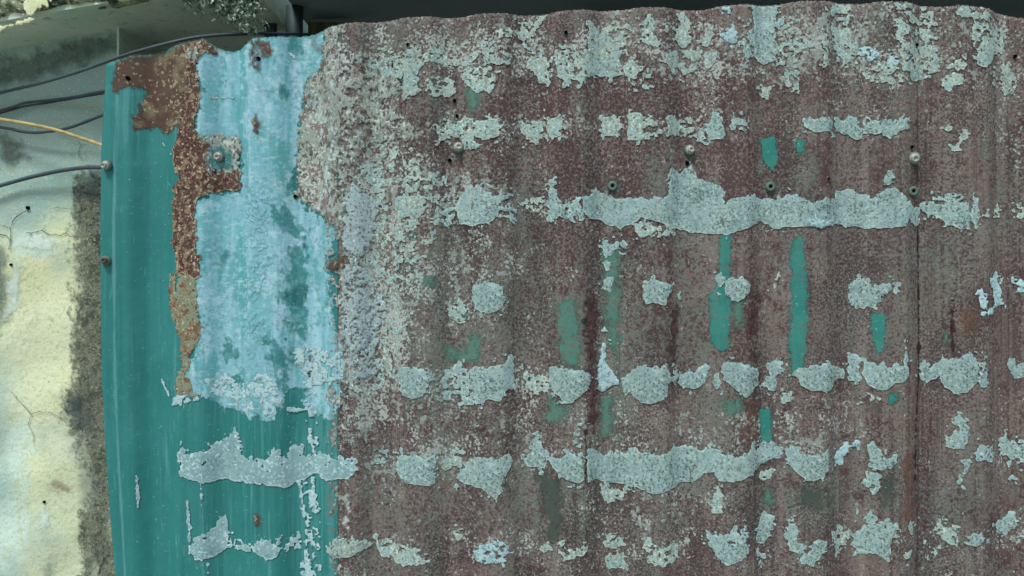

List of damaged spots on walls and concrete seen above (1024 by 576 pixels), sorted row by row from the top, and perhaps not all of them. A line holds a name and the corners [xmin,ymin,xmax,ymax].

rust [112,42,199,135]
peeling [941,6,1020,98]
damp [63,171,115,576]
rust [326,256,344,272]
peeling [172,10,1001,576]
rust [580,282,605,483]
rust [665,305,680,376]
rust [745,291,761,361]
peeling [975,271,1024,316]
peeling [1007,356,1024,379]
peeling [944,411,1024,490]